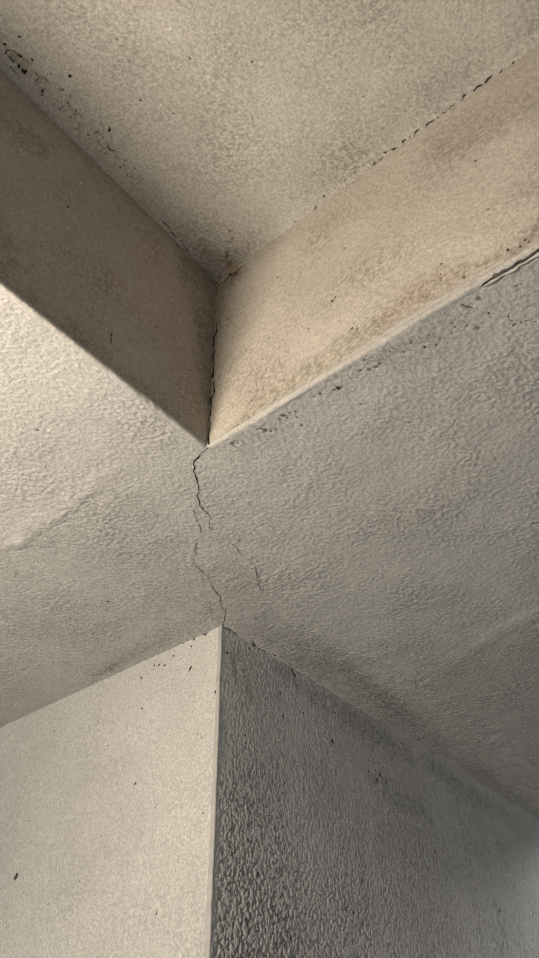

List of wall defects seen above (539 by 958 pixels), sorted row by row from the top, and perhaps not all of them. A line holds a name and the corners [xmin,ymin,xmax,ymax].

crack [192,323,275,656]